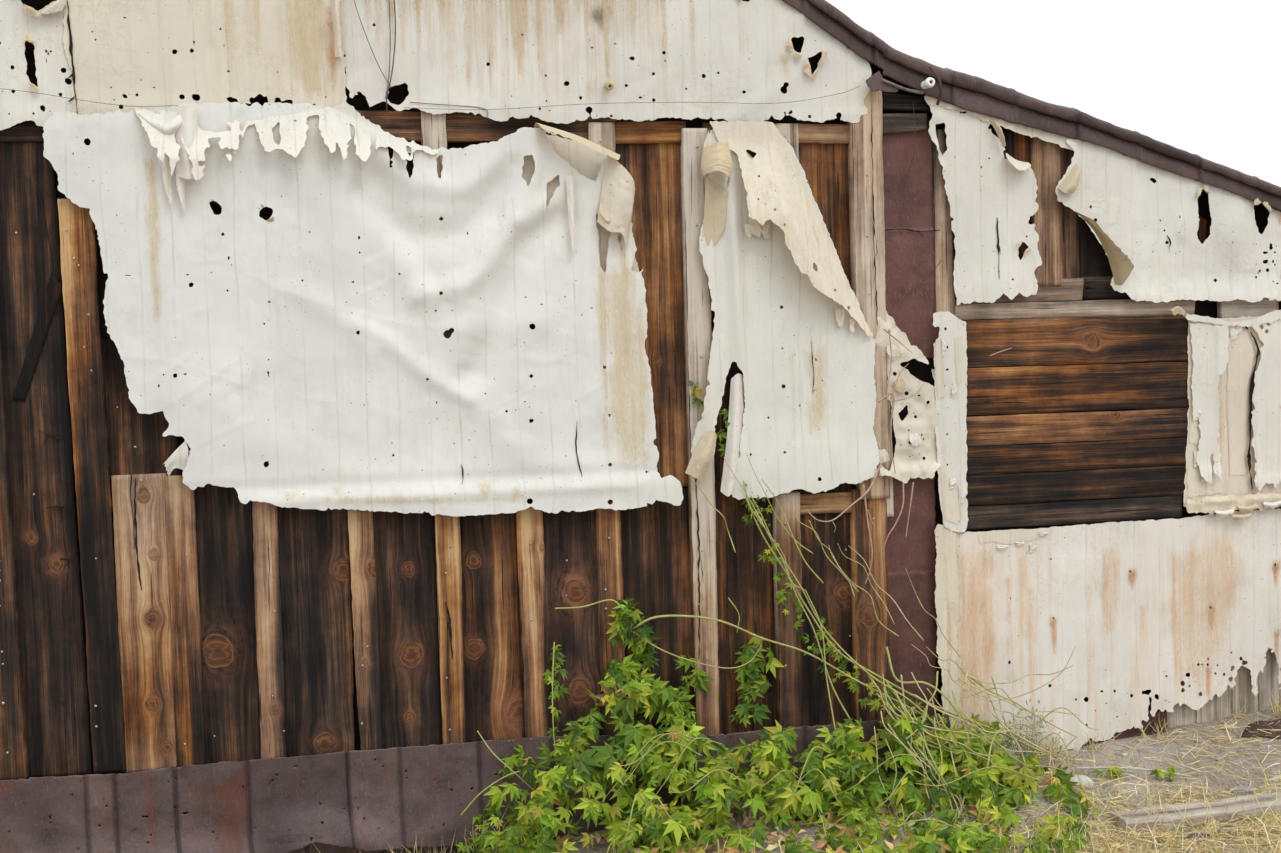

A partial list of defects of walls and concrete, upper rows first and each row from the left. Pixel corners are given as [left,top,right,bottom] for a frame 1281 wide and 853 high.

peeling [23,0,67,43]
peeling [935,335,964,399]
peeling [1187,319,1281,497]
peeling [941,472,967,525]